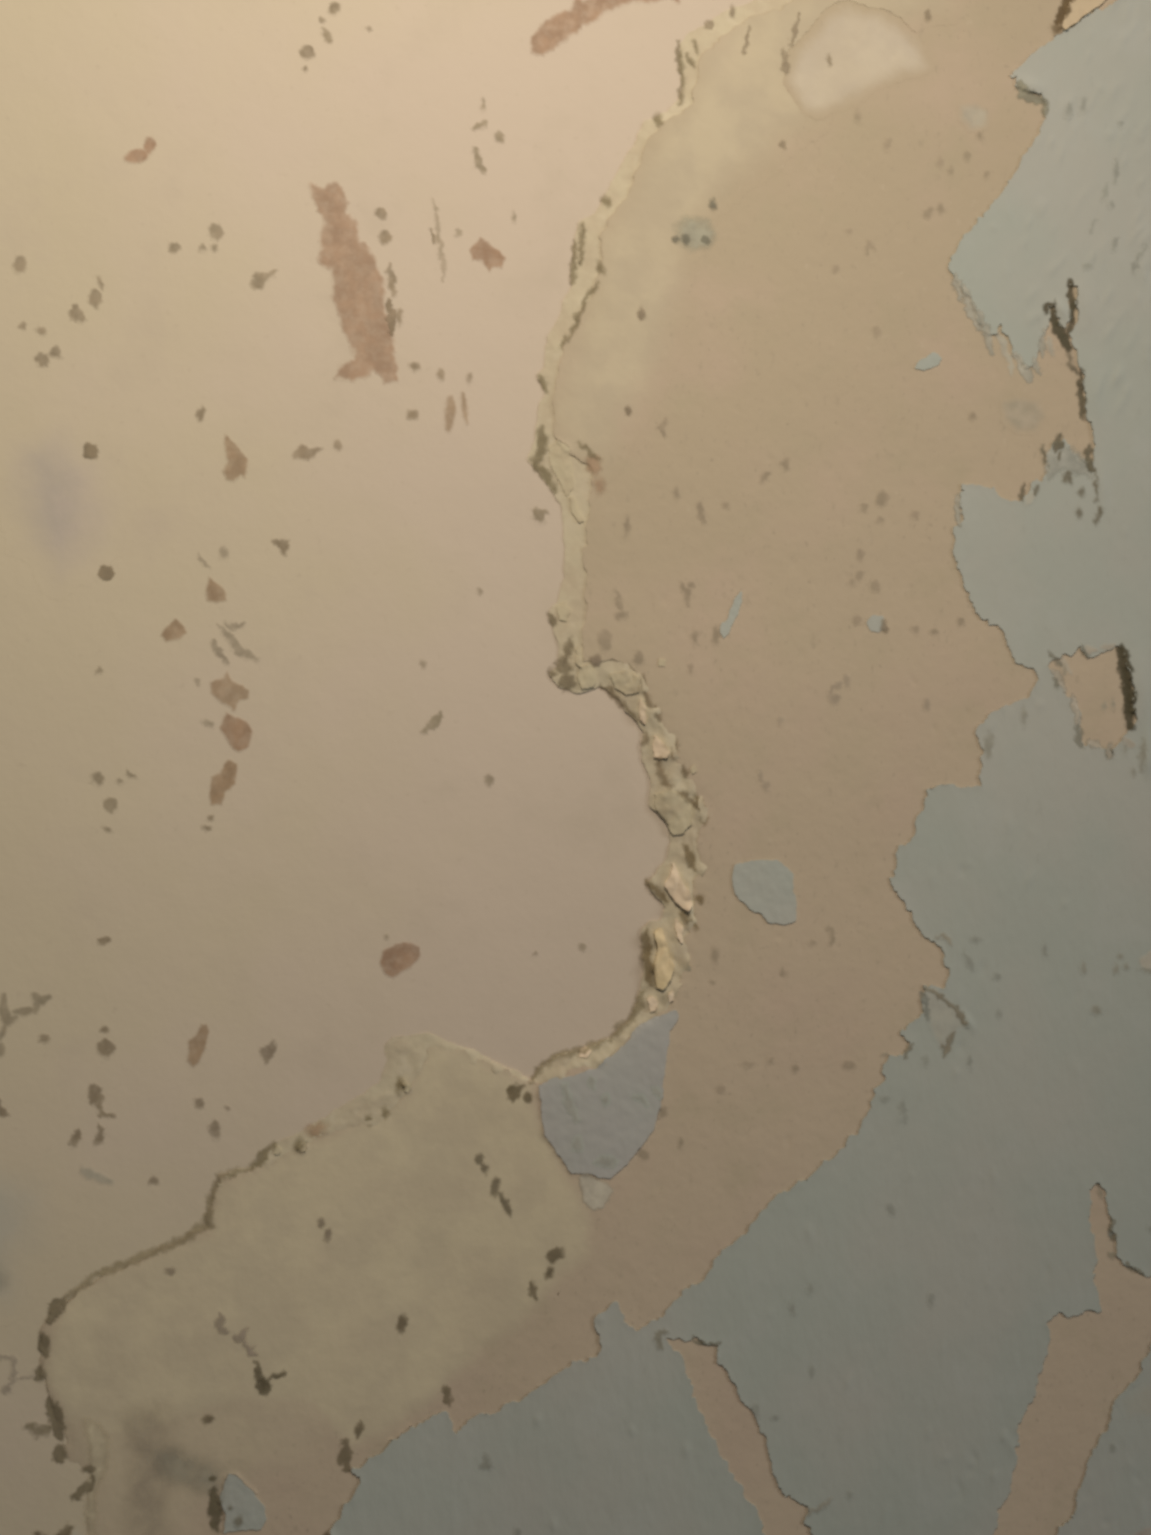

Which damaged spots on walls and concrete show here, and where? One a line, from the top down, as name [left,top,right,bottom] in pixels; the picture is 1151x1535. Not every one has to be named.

peeling [208,0,1117,1535]
peeling [1048,646,1137,750]
peeling [993,1182,1151,1535]